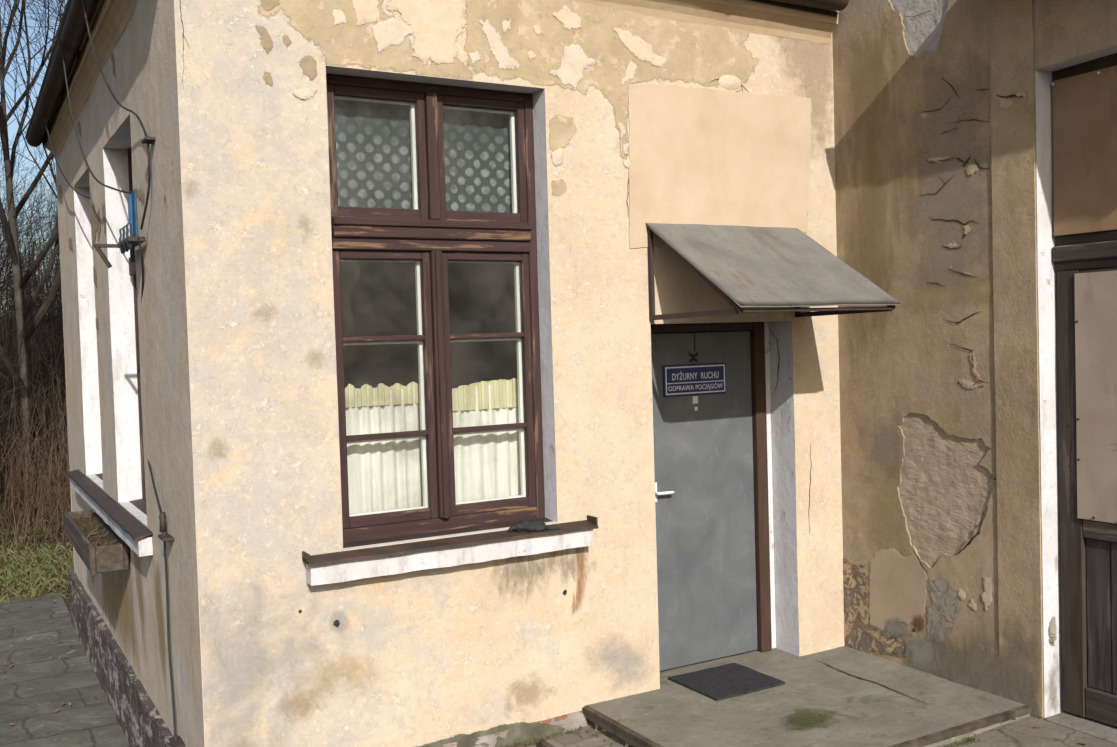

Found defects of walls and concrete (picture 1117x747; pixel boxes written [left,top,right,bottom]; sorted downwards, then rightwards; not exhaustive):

flaking render [890,0,948,58]
peeling [255,0,758,168]
peeling [551,179,567,196]
crack [919,78,1027,287]
crack [943,311,988,390]
flaking render [898,413,996,643]
rust [573,565,584,609]
flaking render [843,557,908,658]